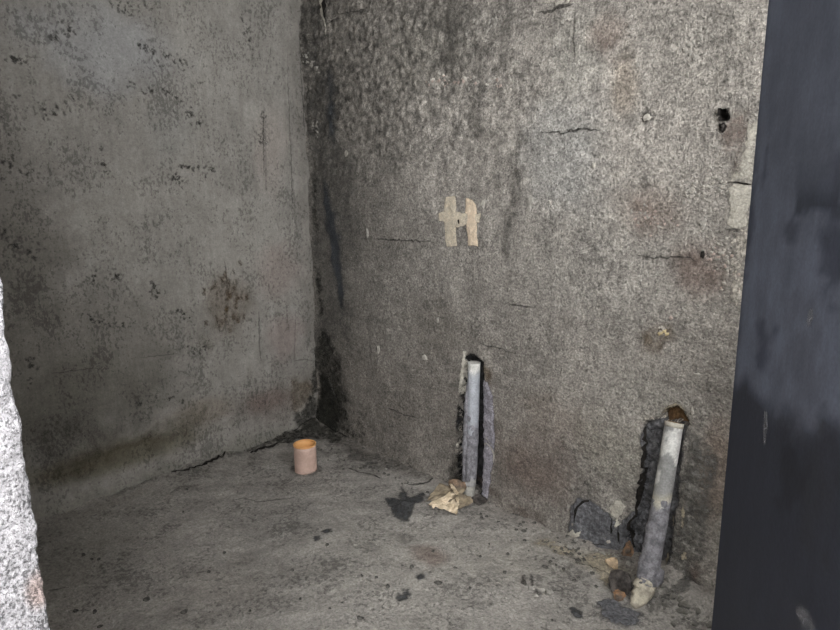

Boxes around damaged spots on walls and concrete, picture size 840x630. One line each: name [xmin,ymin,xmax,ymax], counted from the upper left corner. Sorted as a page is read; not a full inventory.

crack [541,127,599,135]
spalling [717,108,743,133]
damp [312,187,343,306]
crack [372,236,433,244]
crack [636,254,697,262]
damp [266,332,350,443]
spalling [459,351,469,394]
crack [172,429,297,472]